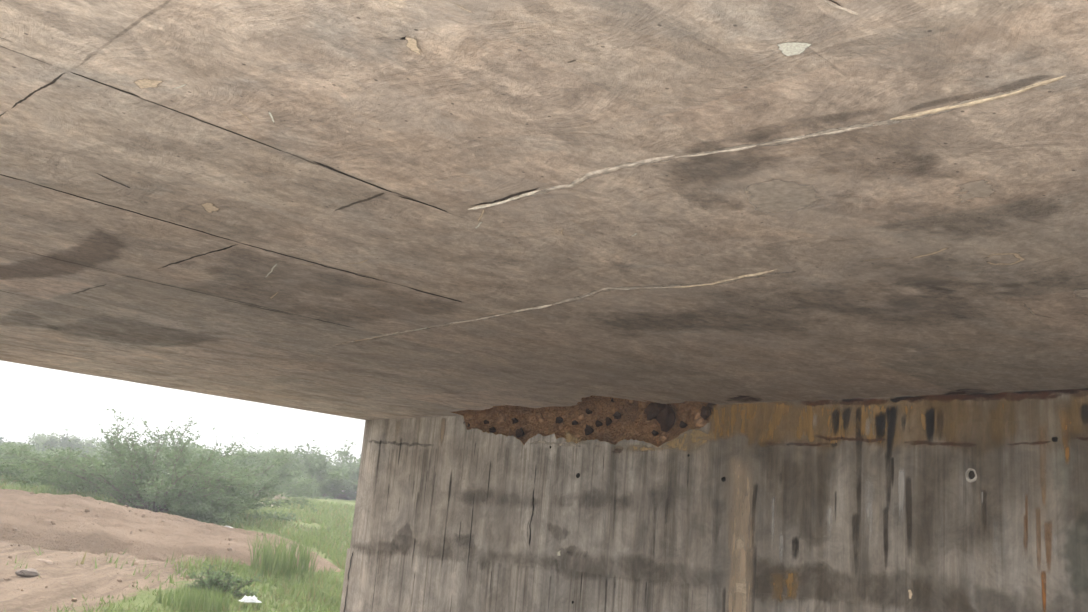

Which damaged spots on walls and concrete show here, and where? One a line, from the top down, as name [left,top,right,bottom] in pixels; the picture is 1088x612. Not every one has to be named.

crack [468,76,1066,210]
spalling [452,396,718,447]
rust [1037,525,1051,612]